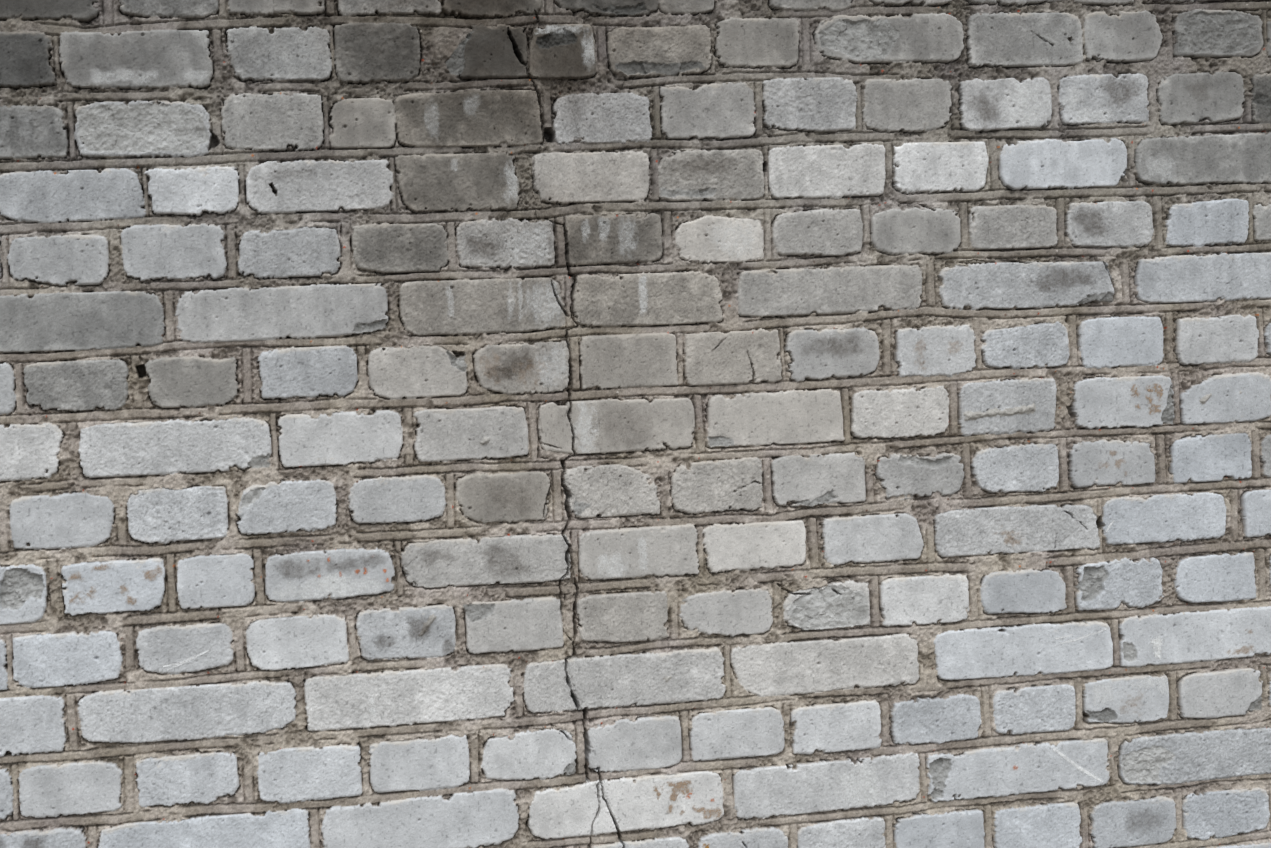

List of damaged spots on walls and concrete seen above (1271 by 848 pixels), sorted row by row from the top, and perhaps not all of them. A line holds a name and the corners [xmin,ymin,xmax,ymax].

corrosion [1131,384,1163,414]
crack [507,10,625,848]
corrosion [654,781,721,819]